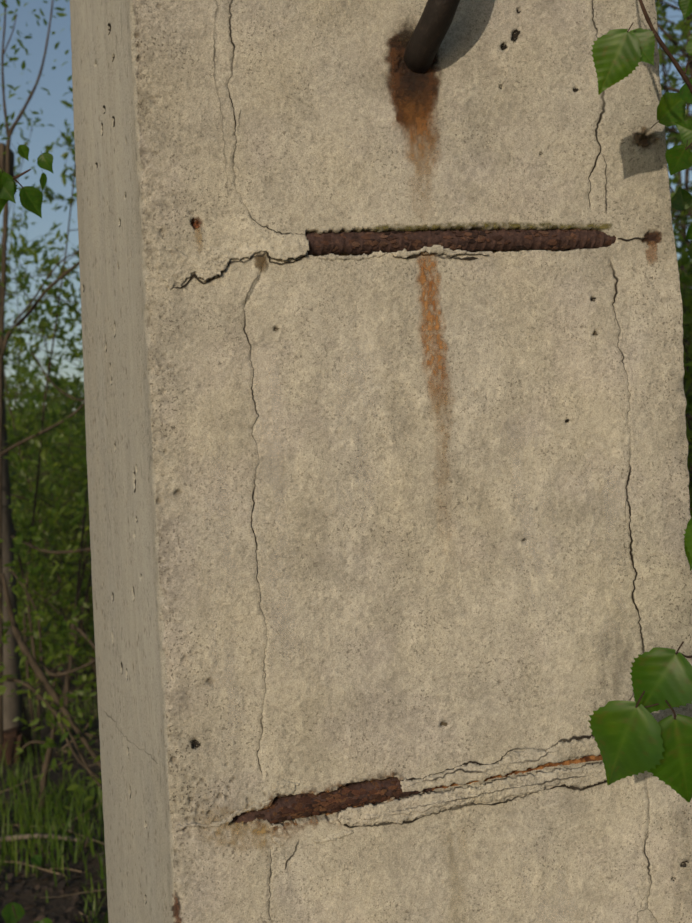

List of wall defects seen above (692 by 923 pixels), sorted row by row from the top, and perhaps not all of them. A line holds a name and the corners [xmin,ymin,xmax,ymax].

crack [214,0,237,161]
rust [386,30,439,168]
crack [588,91,607,210]
spalling [157,214,616,289]
crack [243,293,259,438]
rust [418,258,447,383]
crack [612,269,631,408]
crack [251,481,261,595]
crack [625,463,644,653]
rust [261,772,402,809]
peeling [175,736,607,846]
crack [643,838,652,887]